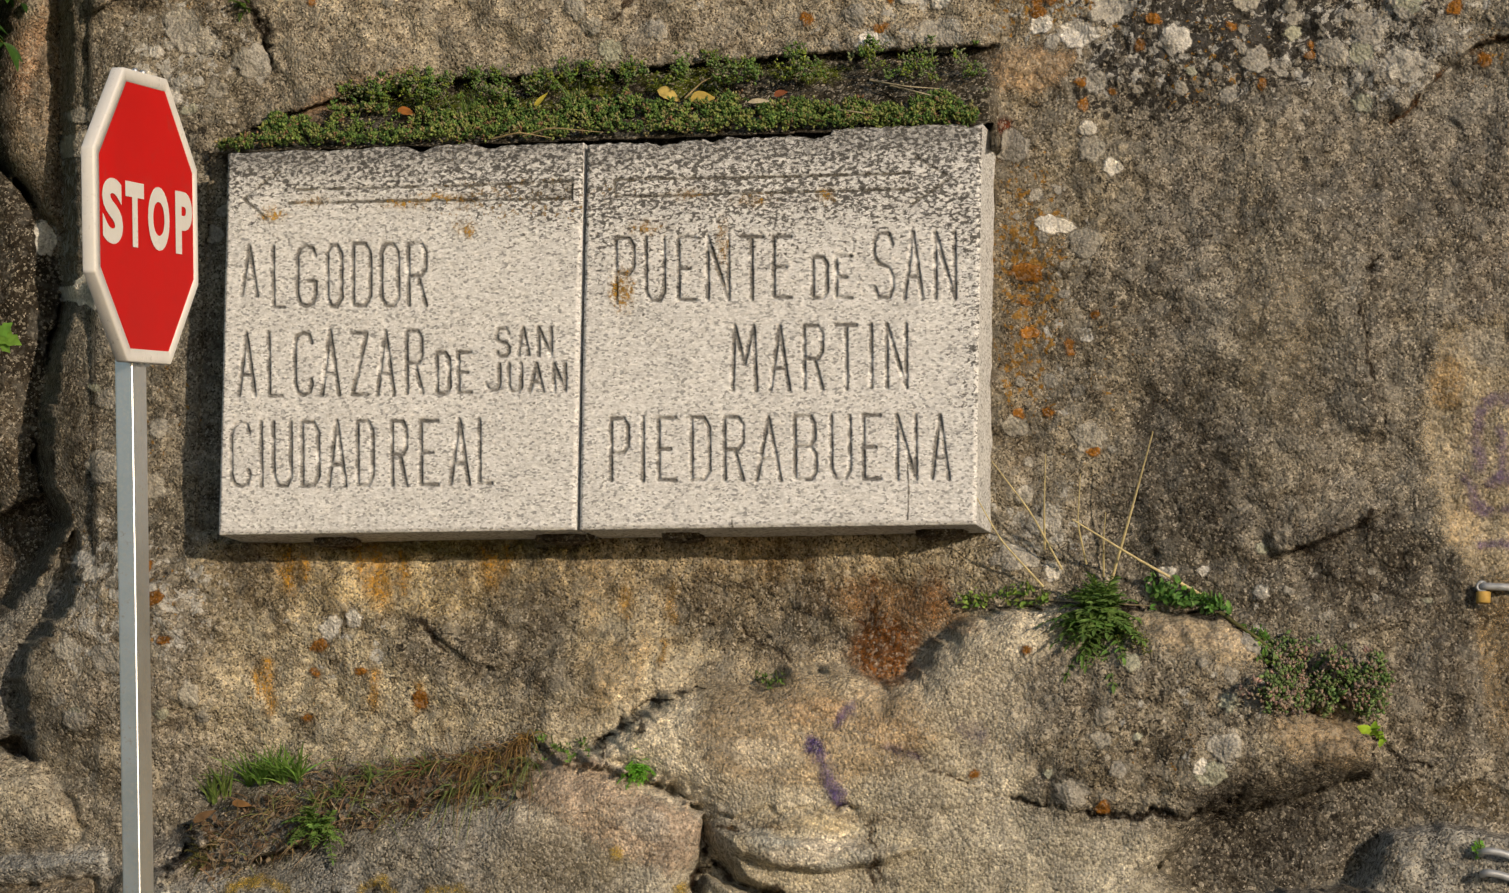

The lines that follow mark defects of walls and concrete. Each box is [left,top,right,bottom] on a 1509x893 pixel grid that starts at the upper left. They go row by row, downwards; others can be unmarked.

crack [245,0,274,72]
crack [1389,34,1509,125]
crack [405,617,449,656]
corrosion [852,575,917,685]
crack [547,685,707,768]
crack [581,812,667,841]
crack [690,825,791,893]
crack [865,820,883,893]